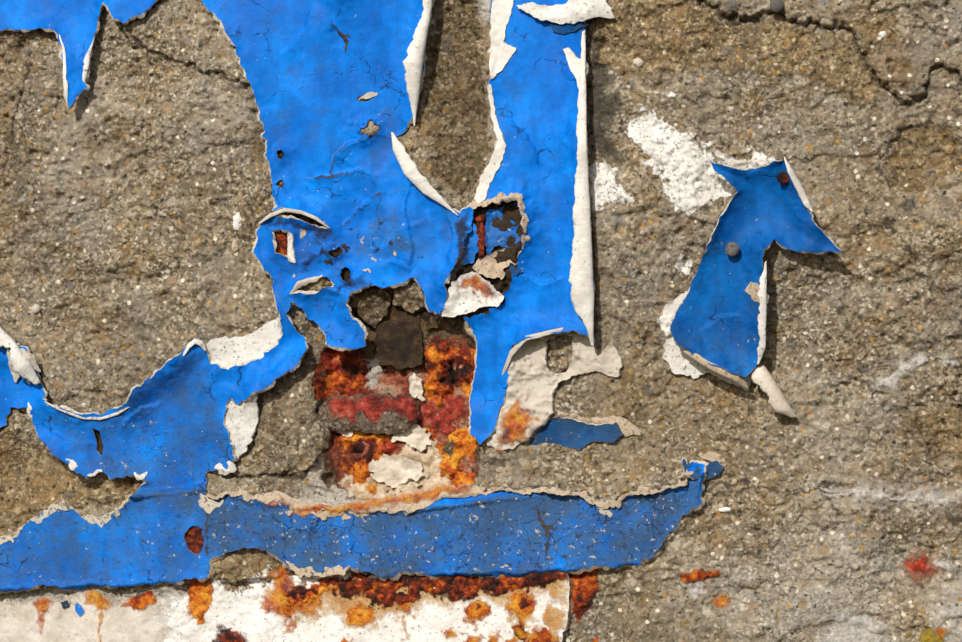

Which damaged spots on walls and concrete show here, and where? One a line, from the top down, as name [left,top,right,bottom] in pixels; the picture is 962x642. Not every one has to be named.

crack [120,25,250,85]
crack [697,0,962,187]
peeling [0,0,887,477]
crack [884,218,918,274]
peeling [0,326,726,594]
corrosion [270,335,479,515]
spalling [896,406,962,466]
peeling [61,600,85,617]
corrosion [187,575,214,625]
corrosion [212,624,247,642]
corrosion [262,566,598,642]